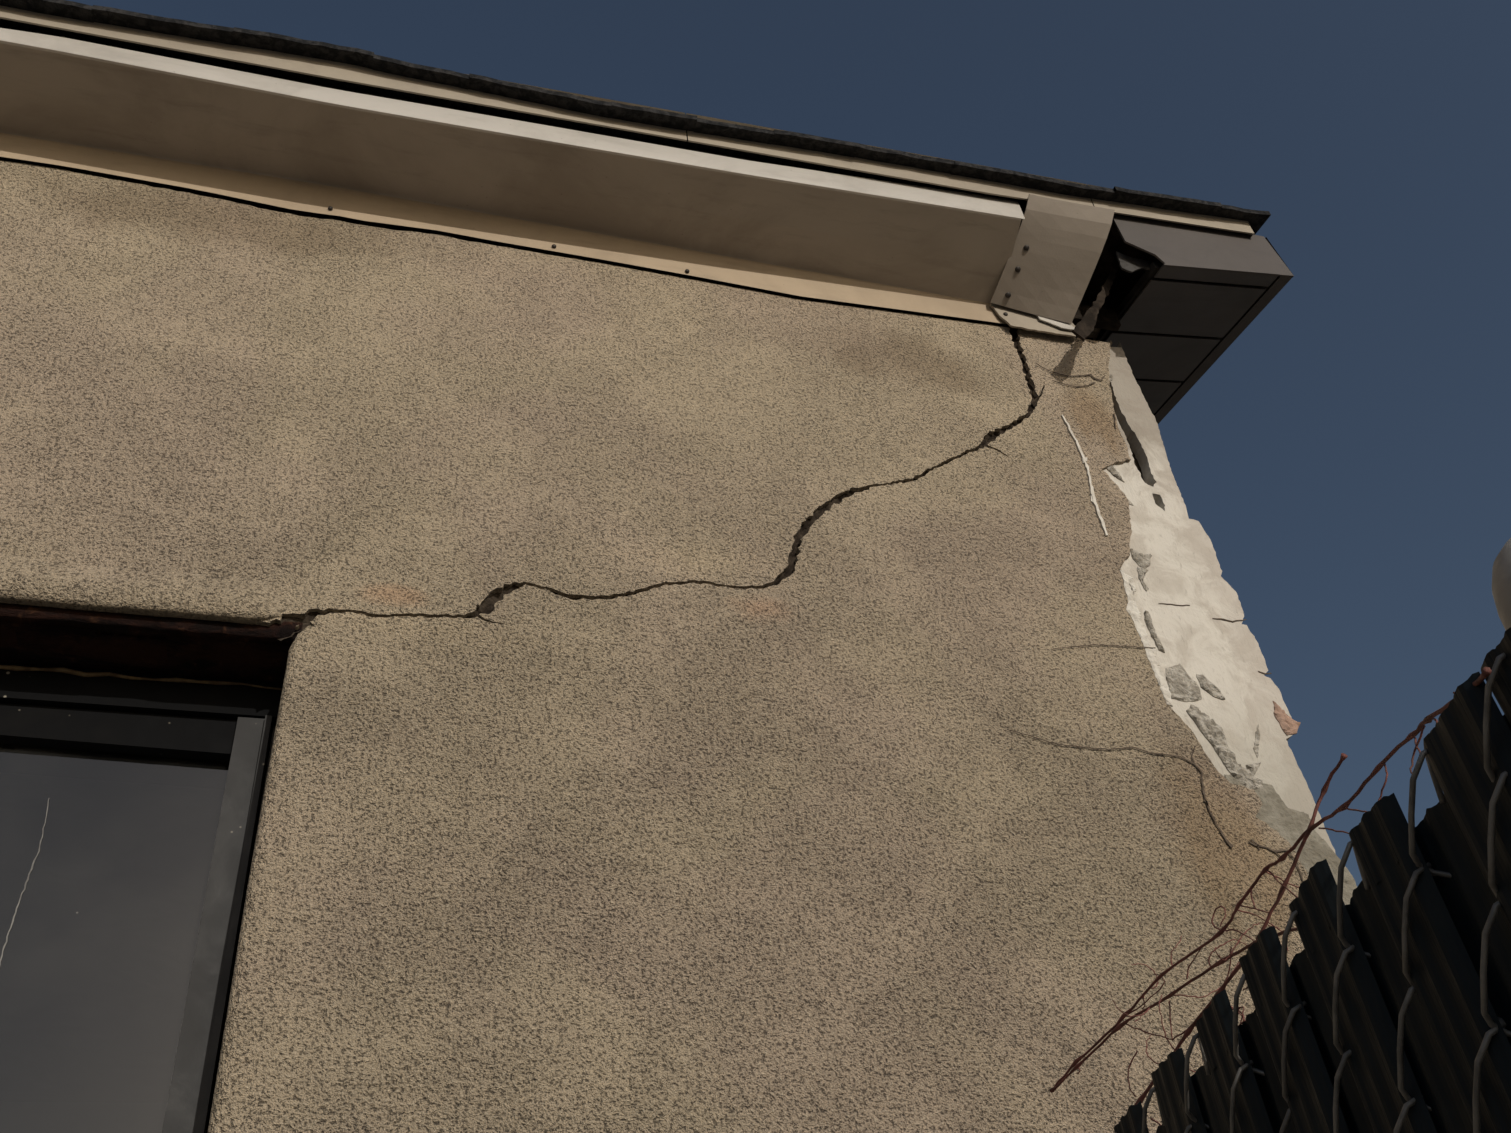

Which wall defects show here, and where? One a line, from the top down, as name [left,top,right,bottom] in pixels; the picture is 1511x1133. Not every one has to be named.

crack [762,324,1144,589]
crack [272,611,334,641]
crack [466,583,703,619]
spalling [1061,342,1357,905]